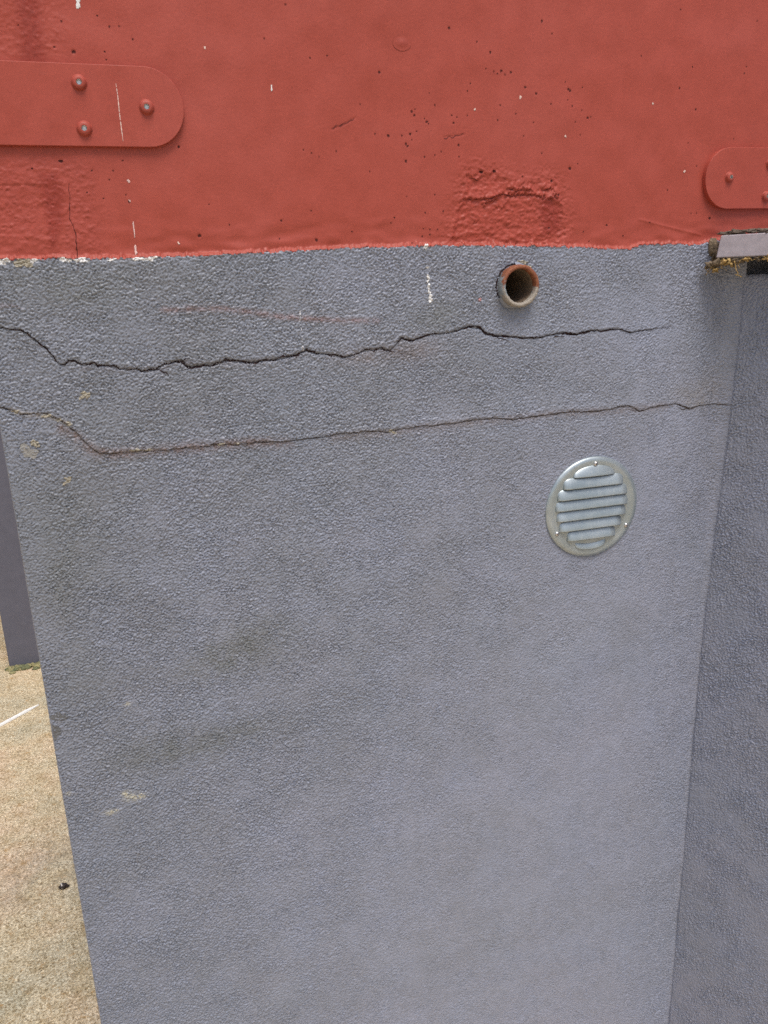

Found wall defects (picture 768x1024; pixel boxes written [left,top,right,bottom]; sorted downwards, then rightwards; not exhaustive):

crack [1,326,675,377]
crack [0,399,726,466]